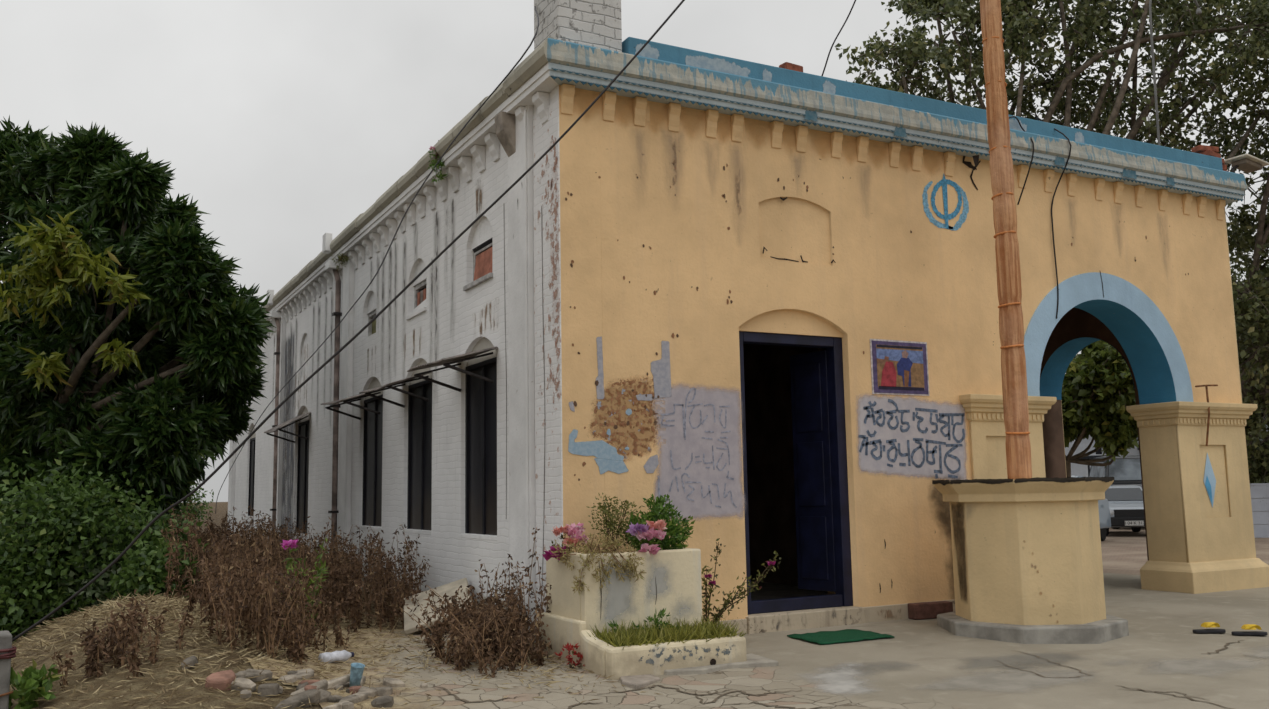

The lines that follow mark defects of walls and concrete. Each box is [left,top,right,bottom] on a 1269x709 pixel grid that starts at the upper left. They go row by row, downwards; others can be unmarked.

peeling [635,43,659,59]
peeling [685,55,772,82]
peeling [538,135,580,412]
peeling [568,333,679,481]